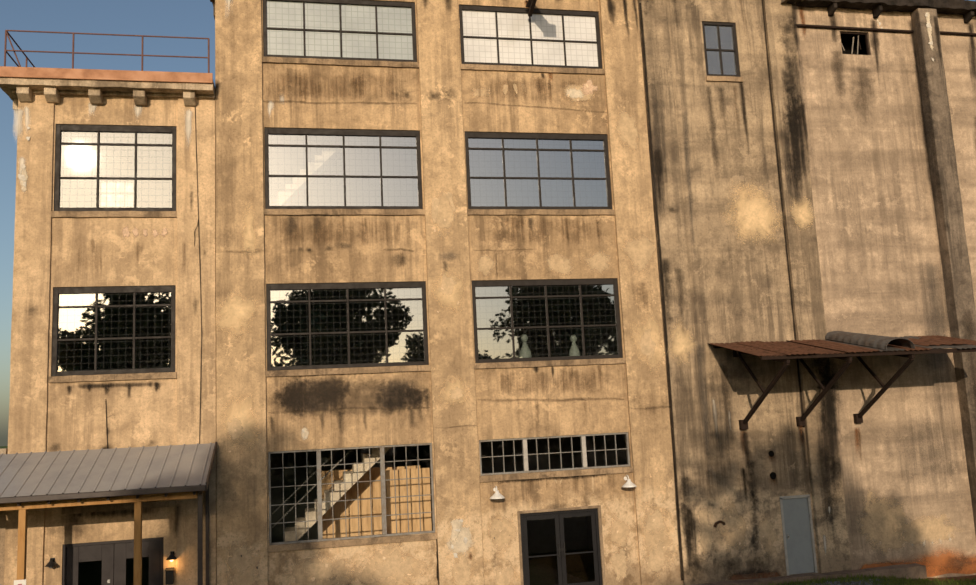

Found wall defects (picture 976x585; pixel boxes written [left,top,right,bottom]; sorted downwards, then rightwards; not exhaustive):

water stain [786,63,808,196]
water stain [279,374,428,424]
water stain [819,362,837,524]
peeling [447,519,473,585]